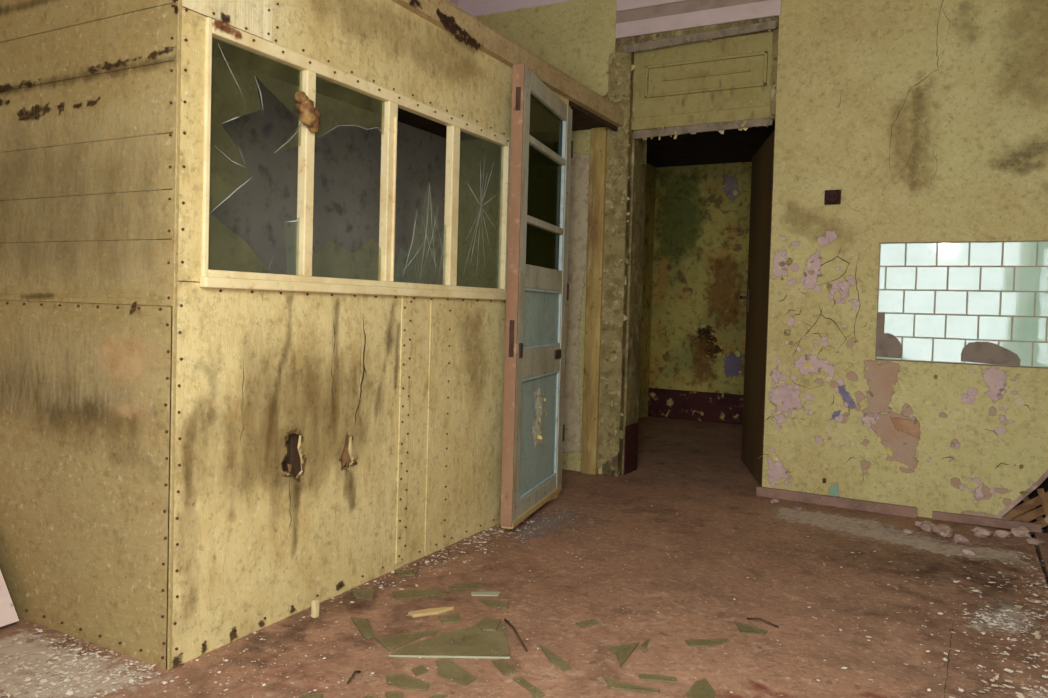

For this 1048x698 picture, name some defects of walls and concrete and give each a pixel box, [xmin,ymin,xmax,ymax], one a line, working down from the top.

water stain [656,175,703,258]
water stain [706,256,743,325]
peeling [771,231,837,289]
peeling [828,278,860,306]
water stain [293,371,339,447]
peeling [768,312,921,473]
peeling [961,342,1021,404]
spalling [756,455,1048,698]